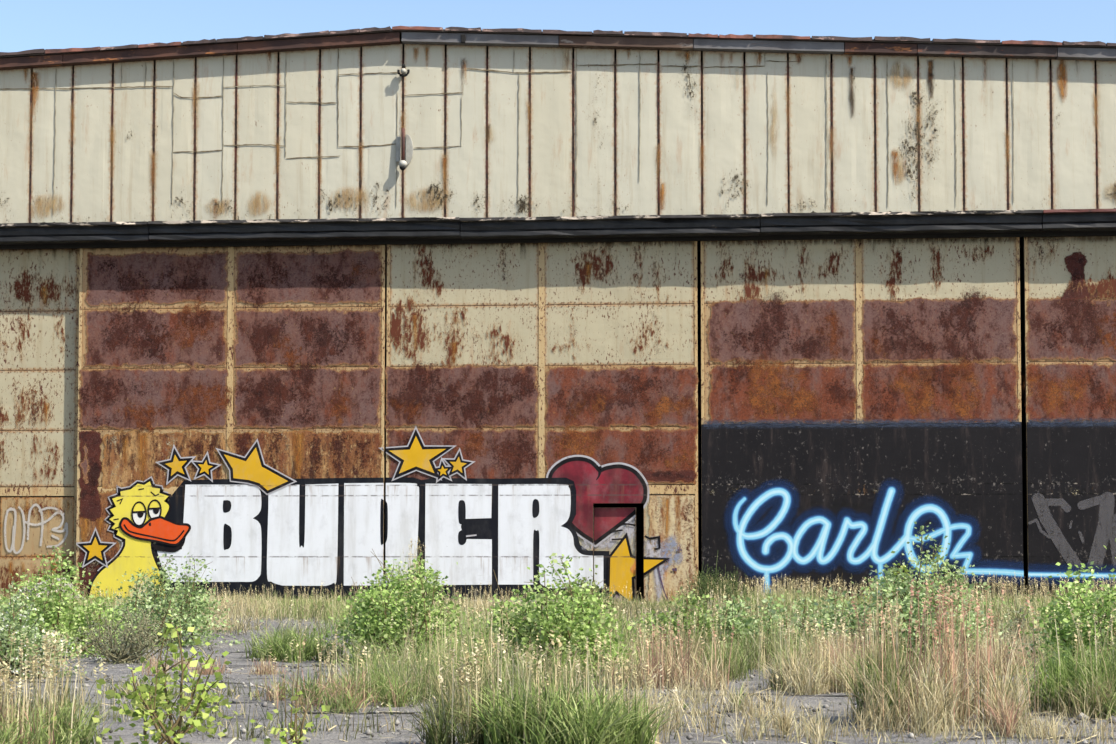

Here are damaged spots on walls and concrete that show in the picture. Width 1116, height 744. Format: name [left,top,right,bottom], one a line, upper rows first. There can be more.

mould [899,79,946,198]
corrosion [1057,61,1067,97]
corrosion [0,240,1116,603]